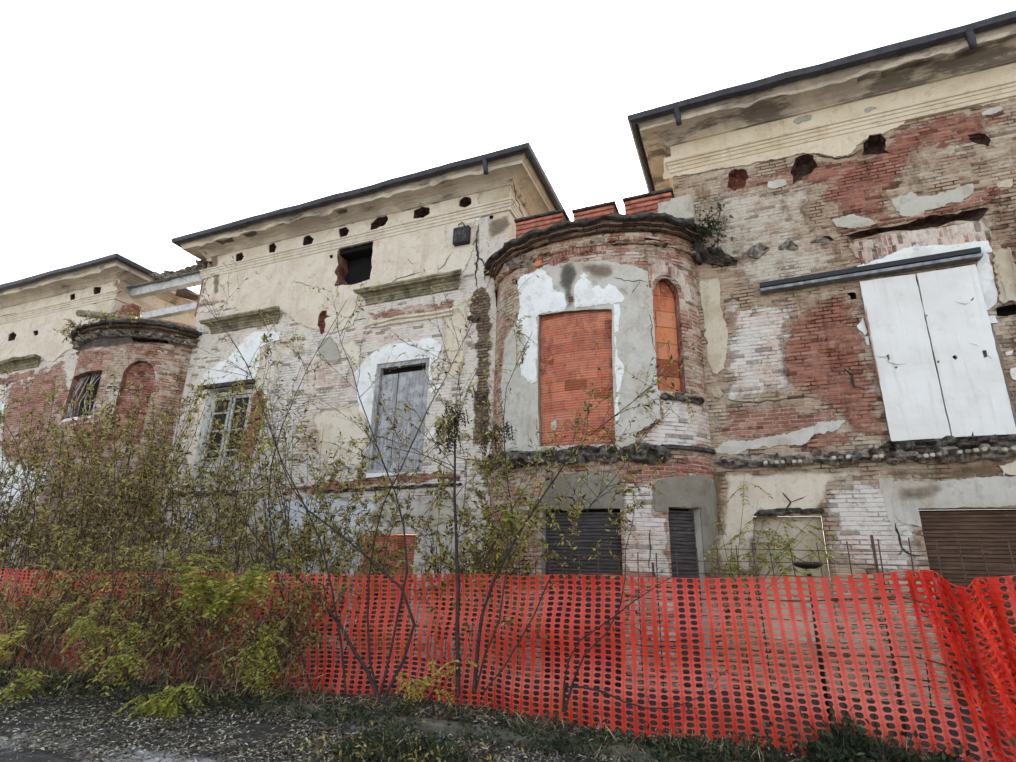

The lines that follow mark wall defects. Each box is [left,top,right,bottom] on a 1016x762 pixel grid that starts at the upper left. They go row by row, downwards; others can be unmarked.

flaking render [503,268,624,421]
damp [561,264,610,305]
flaking render [617,278,890,481]
flaking render [715,106,1016,380]